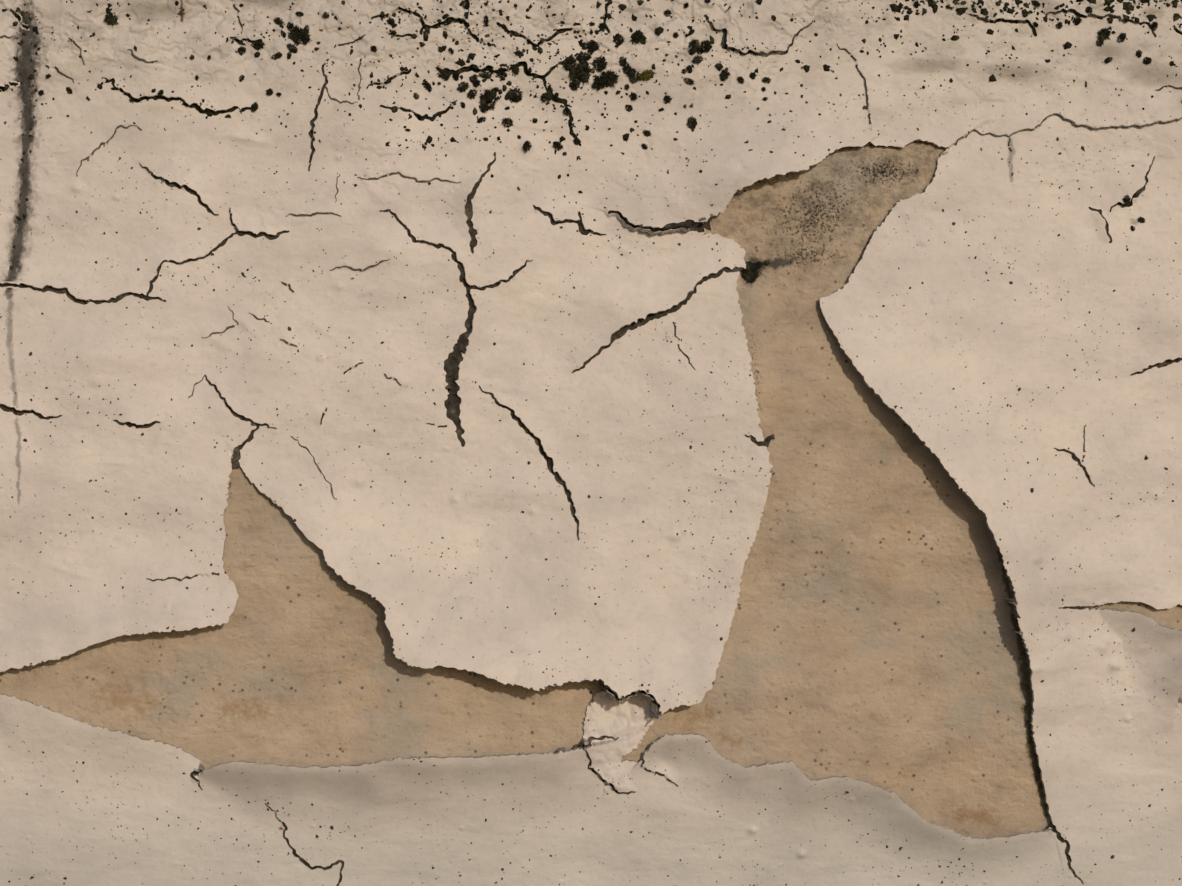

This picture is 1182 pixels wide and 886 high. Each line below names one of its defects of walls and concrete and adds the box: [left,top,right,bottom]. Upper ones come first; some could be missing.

water stain [6,12,40,290]
crack [45,37,257,177]
crack [308,0,610,171]
crack [533,206,711,236]
crack [705,6,813,56]
crack [955,113,1182,176]
crack [1089,156,1155,243]
crack [0,152,580,540]
crack [572,267,743,373]
peeling [0,271,773,821]
peeling [605,97,1182,872]
crack [265,803,344,886]